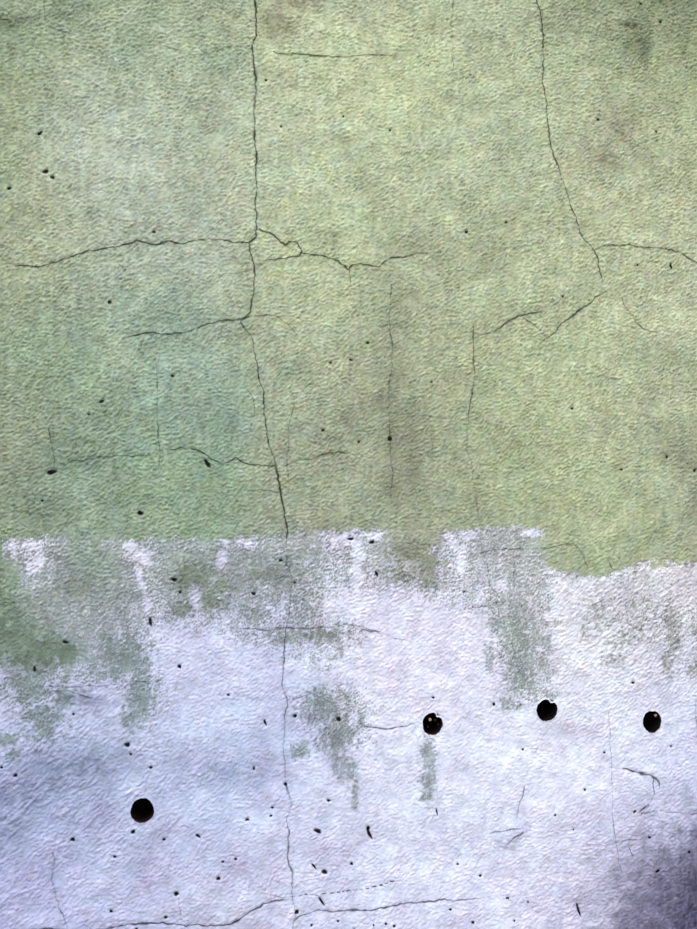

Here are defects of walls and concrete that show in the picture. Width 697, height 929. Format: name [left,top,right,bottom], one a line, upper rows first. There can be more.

crack [468,3,696,414]
crack [15,0,427,576]
crack [242,627,311,749]
crack [622,768,660,814]
crack [110,881,475,929]